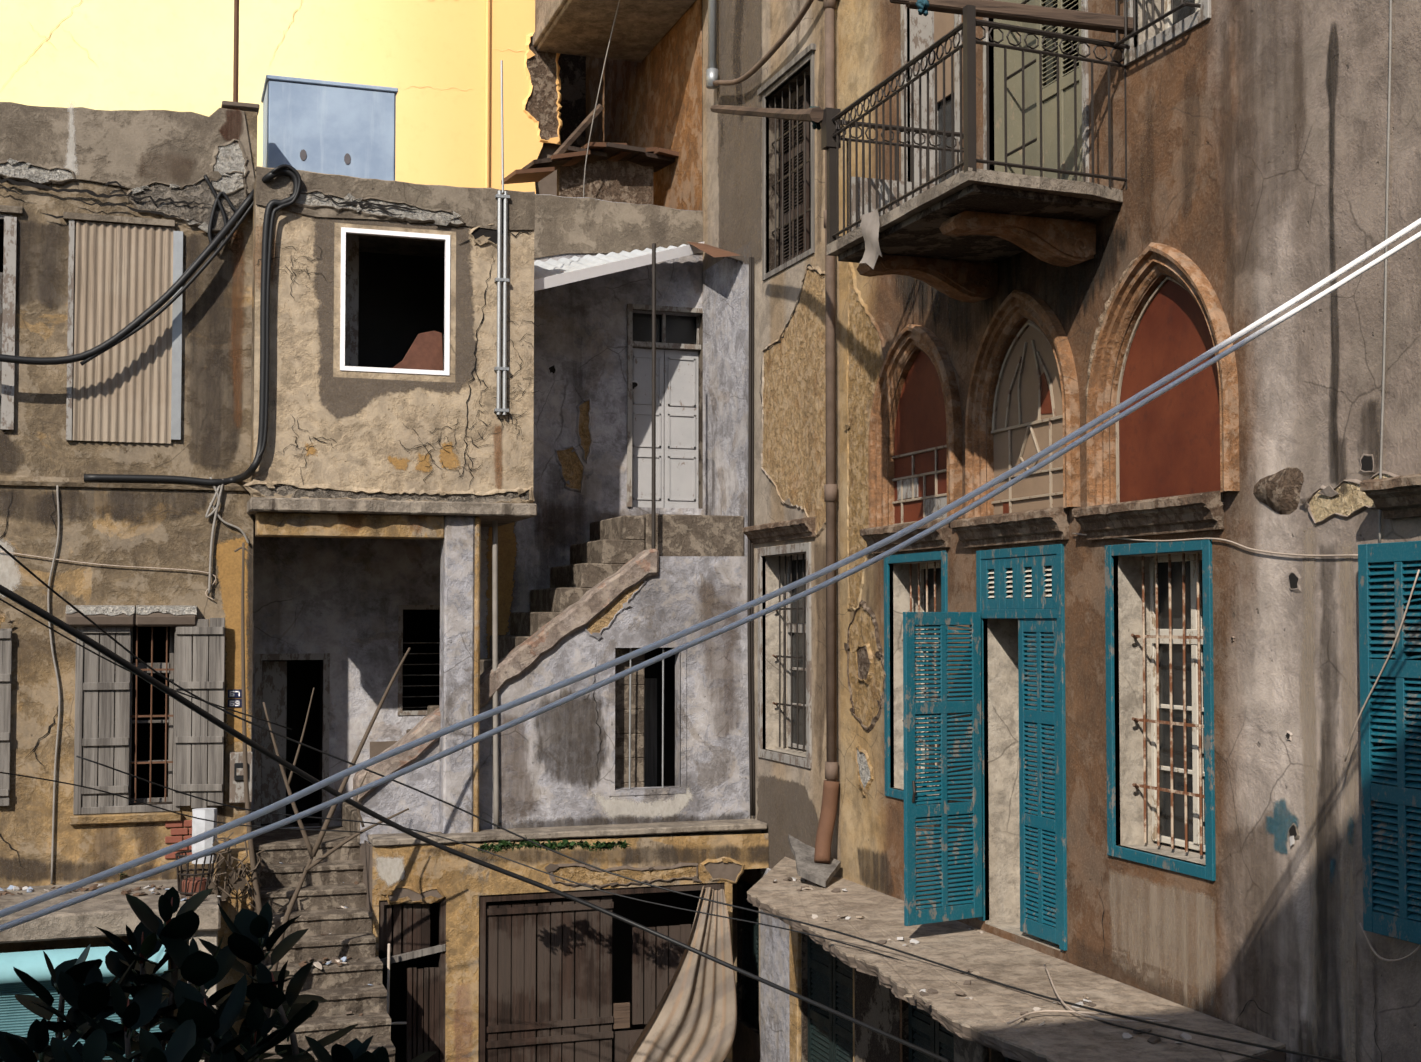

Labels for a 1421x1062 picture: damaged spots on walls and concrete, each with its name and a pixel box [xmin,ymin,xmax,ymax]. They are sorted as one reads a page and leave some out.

spalling [522,33,562,145]
spalling [0,158,77,184]
spalling [125,139,250,234]
spalling [287,189,503,249]
water stain [1326,28,1346,493]
spalling [243,478,535,503]
crack [399,231,544,487]
peeling [486,522,518,658]
spalling [761,266,826,537]
spalling [843,262,886,796]
water stain [1368,400,1380,477]
water stain [1298,531,1358,1062]